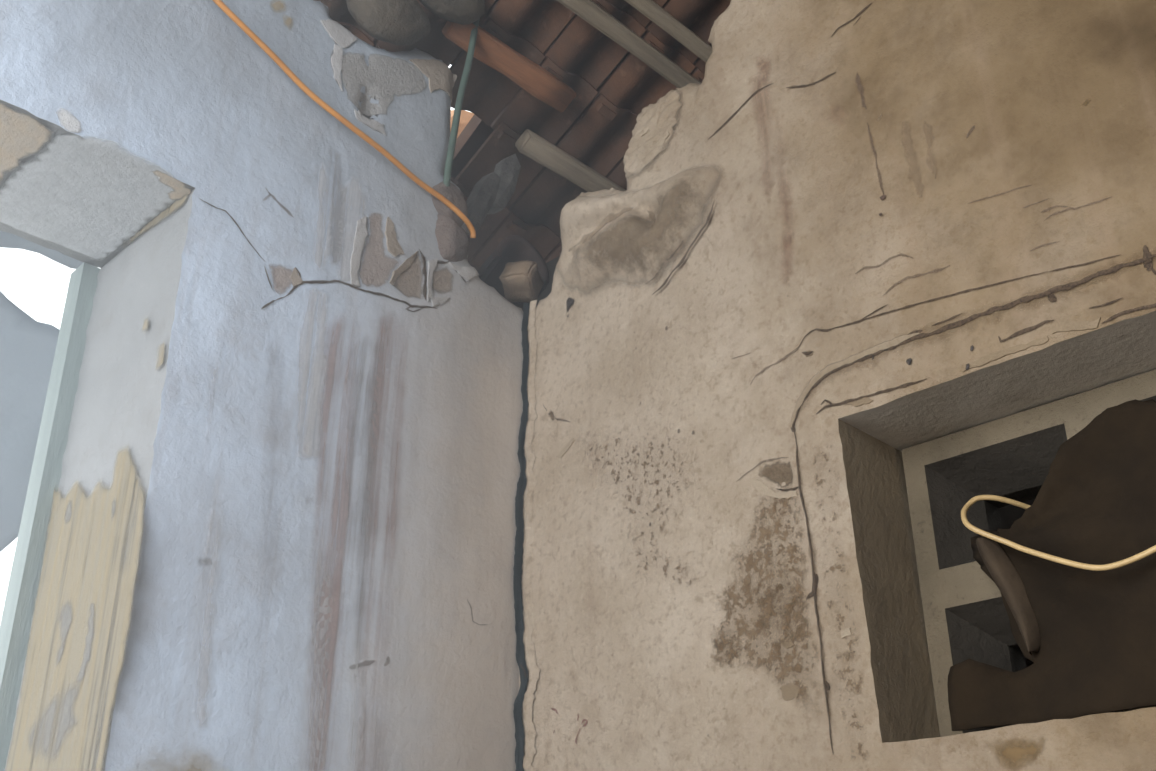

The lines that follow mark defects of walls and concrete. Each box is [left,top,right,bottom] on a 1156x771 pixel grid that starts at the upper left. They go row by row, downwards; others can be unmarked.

peeling [0,104,49,180]
peeling [320,19,474,138]
crack [710,72,836,138]
peeling [130,171,191,240]
crack [263,189,293,217]
flaking render [269,265,303,293]
crack [200,199,437,312]
flaking render [349,213,479,306]
crack [784,185,1156,752]
peeling [5,448,144,771]